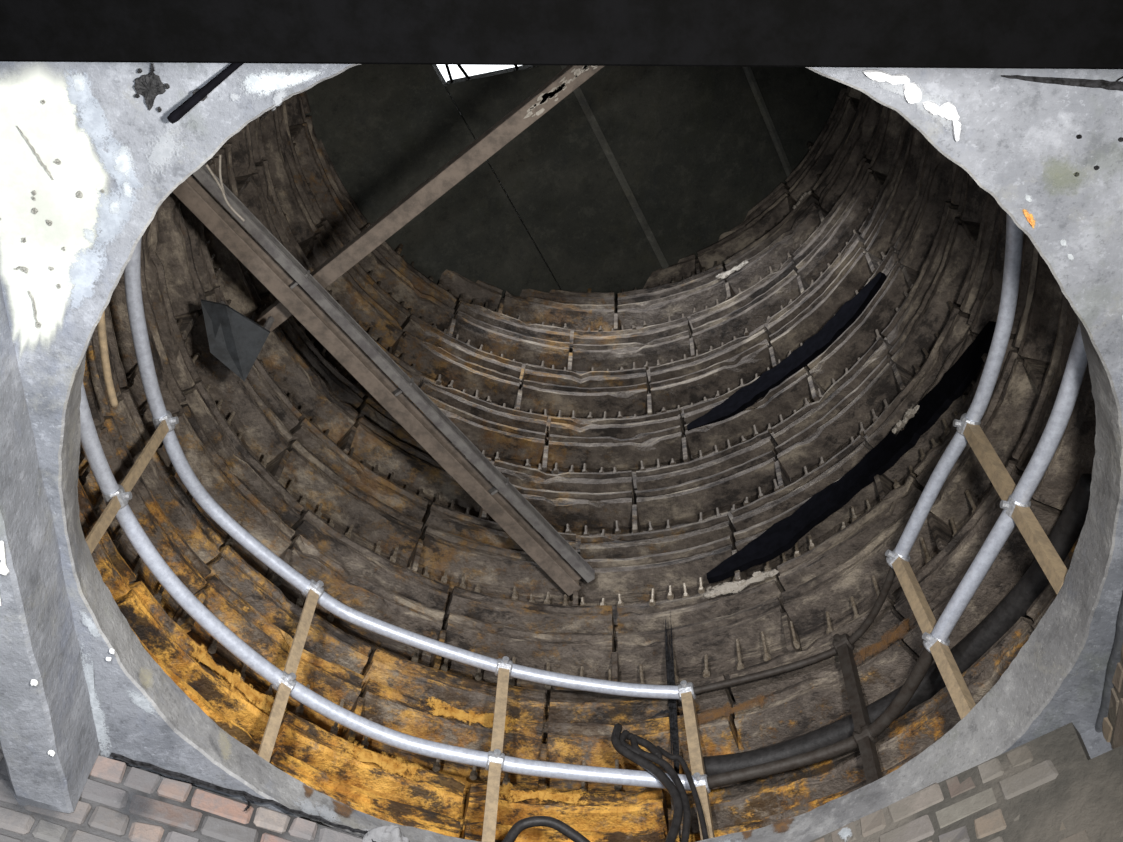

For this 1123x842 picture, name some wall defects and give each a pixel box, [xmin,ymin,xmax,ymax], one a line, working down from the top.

peeling [862,70,961,141]
crack [1001,75,1123,91]
leakage [64,69,183,308]
crack [110,752,366,834]